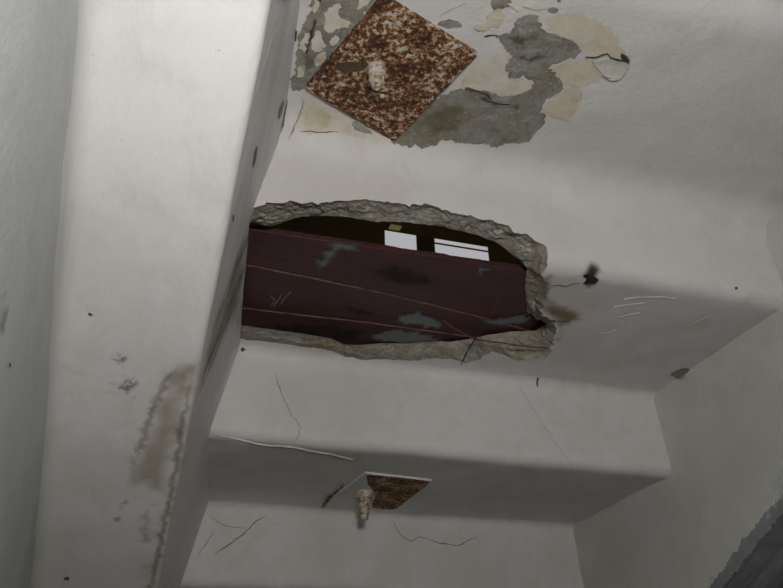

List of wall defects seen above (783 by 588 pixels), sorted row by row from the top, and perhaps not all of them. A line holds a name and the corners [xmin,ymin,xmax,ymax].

peeling [278,0,630,149]
spalling [240,199,574,365]
crack [197,516,266,556]
crack [392,519,480,546]